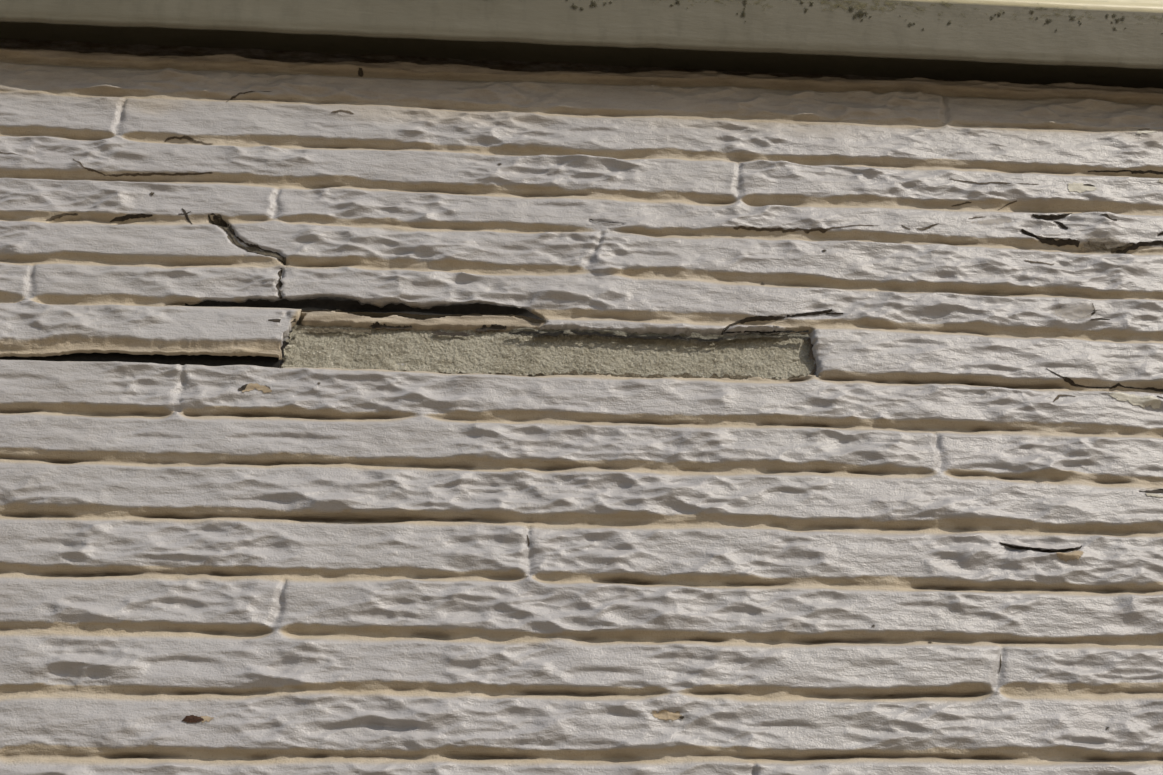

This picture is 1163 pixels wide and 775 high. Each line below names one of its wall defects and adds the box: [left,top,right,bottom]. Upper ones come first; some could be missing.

crack [73,136,213,177]
crack [1088,168,1163,176]
crack [110,213,152,222]
crack [733,178,1080,265]
crack [1100,214,1163,254]
crack [165,208,544,320]
crack [721,309,843,335]
spalling [281,322,817,380]
crack [1046,368,1163,402]
crack [1000,539,1082,553]